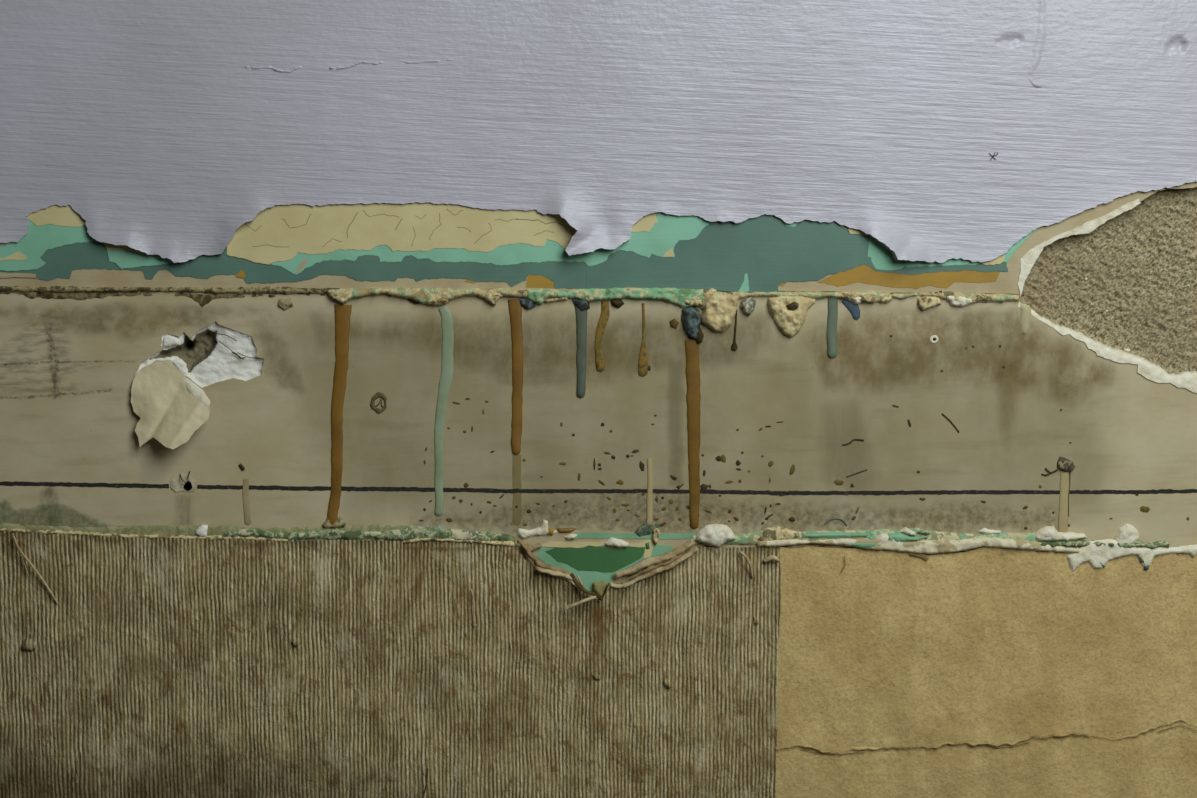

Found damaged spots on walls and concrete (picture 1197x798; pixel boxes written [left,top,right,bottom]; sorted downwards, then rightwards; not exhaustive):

peeling [0,187,1197,393]
spalling [131,321,264,449]
peeling [604,538,629,548]
crack [802,748,860,756]